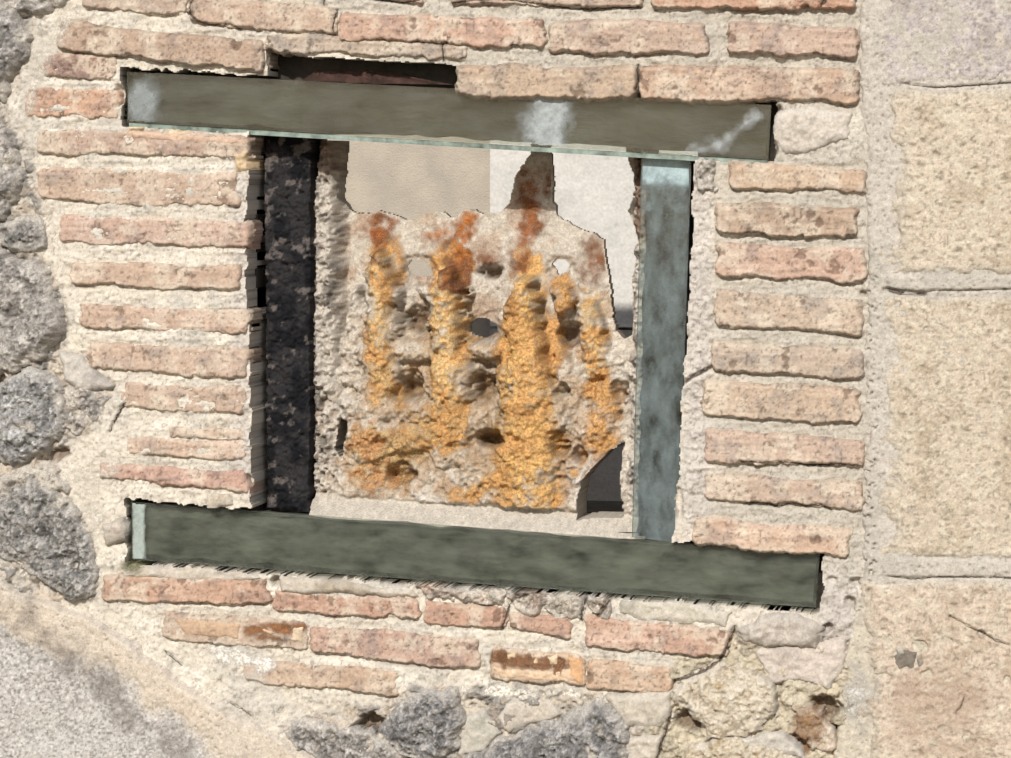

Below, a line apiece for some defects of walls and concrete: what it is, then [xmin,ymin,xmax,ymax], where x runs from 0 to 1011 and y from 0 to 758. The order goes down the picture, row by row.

corrosion [345,170,624,510]